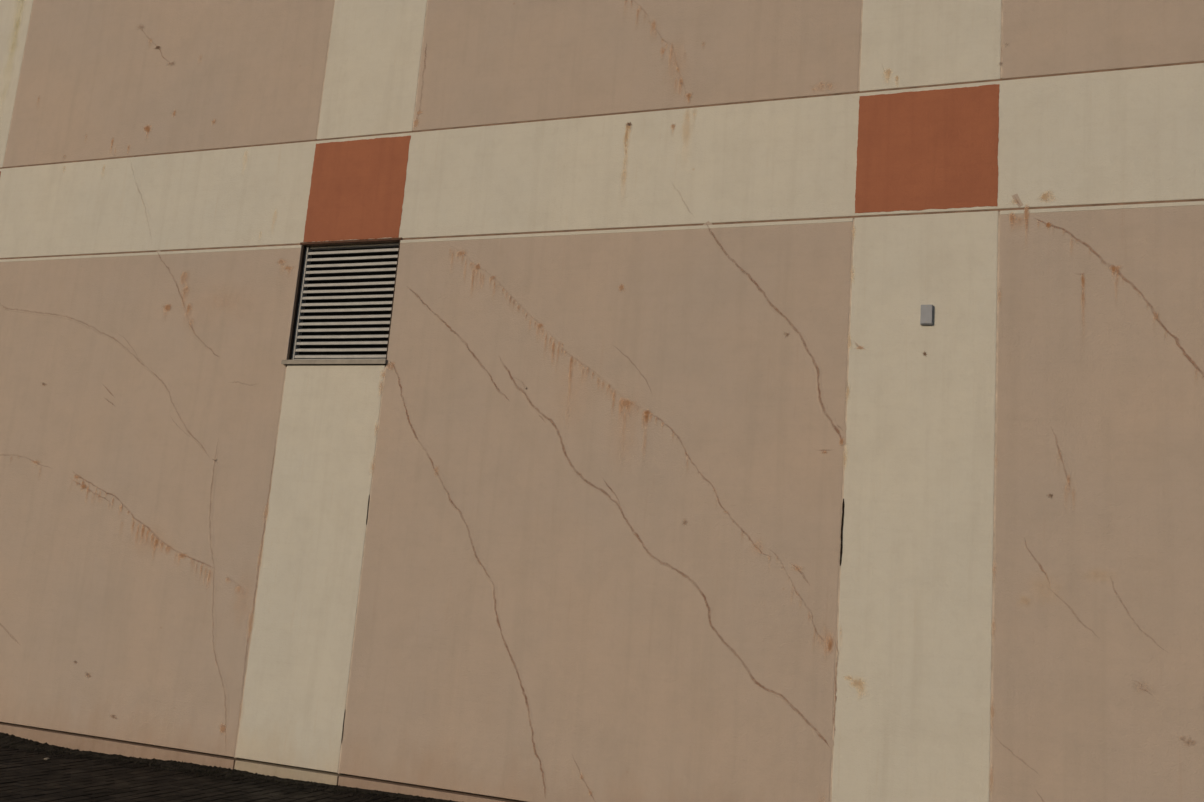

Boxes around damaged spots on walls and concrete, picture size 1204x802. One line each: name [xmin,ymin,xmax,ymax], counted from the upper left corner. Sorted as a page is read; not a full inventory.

crack [156,250,222,359]
crack [703,221,847,453]
crack [1033,215,1204,381]
crack [0,451,248,593]
crack [388,359,548,798]
crack [405,284,834,750]
crack [838,499,846,566]